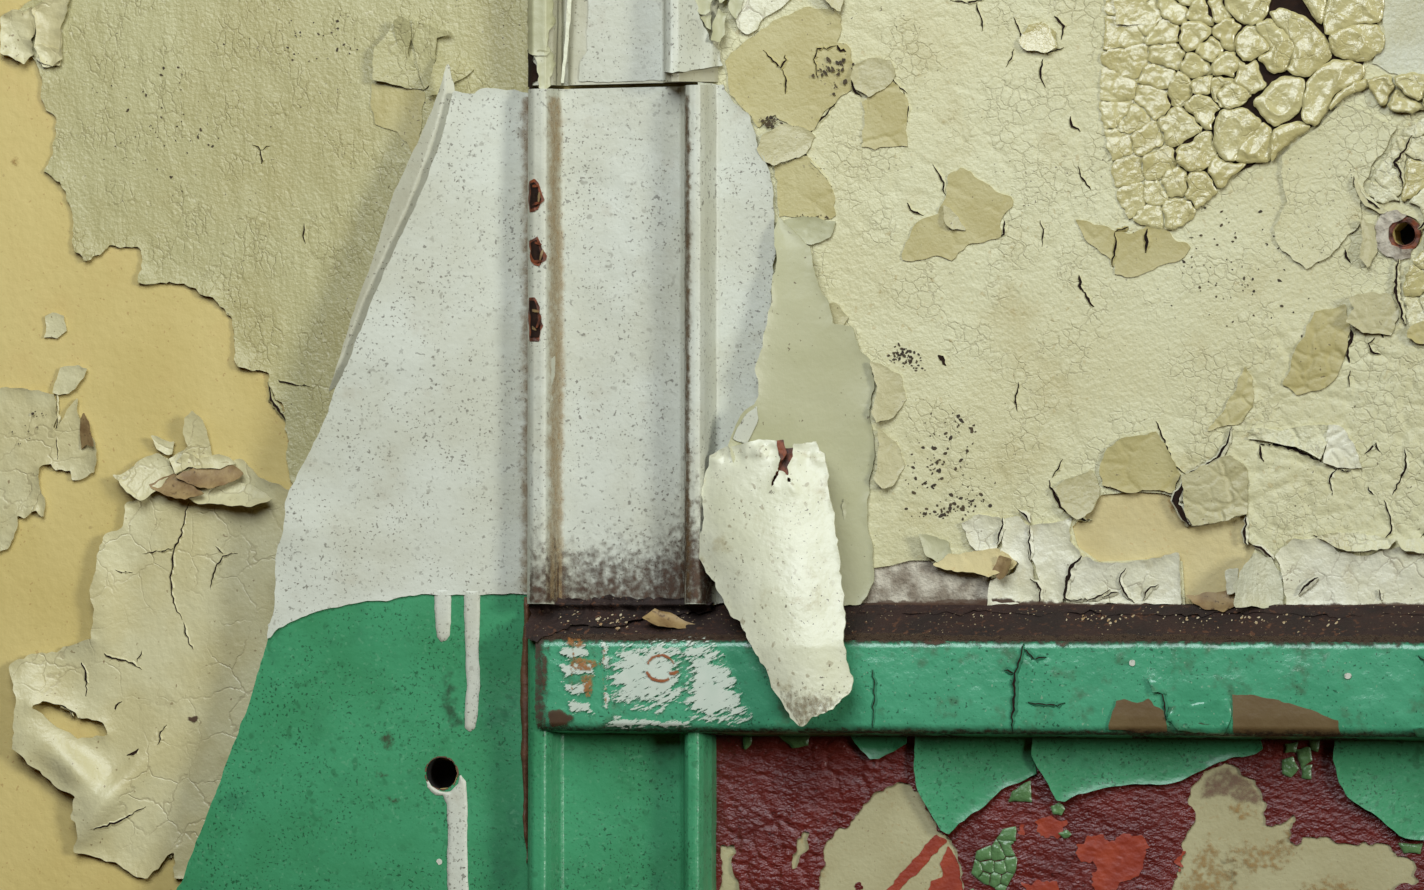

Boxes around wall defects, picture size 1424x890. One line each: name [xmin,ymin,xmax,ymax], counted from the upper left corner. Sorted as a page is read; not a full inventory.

crack [1352,135,1413,209]
crack [1345,220,1424,387]
peeling [579,0,1424,748]
crack [116,503,238,649]
peeling [0,0,572,890]
crack [1241,517,1274,560]
crack [1156,421,1424,552]
crack [58,651,144,716]
crack [1004,644,1065,732]
crack [90,806,146,830]
peeling [719,845,739,890]
peeling [792,678,1424,890]